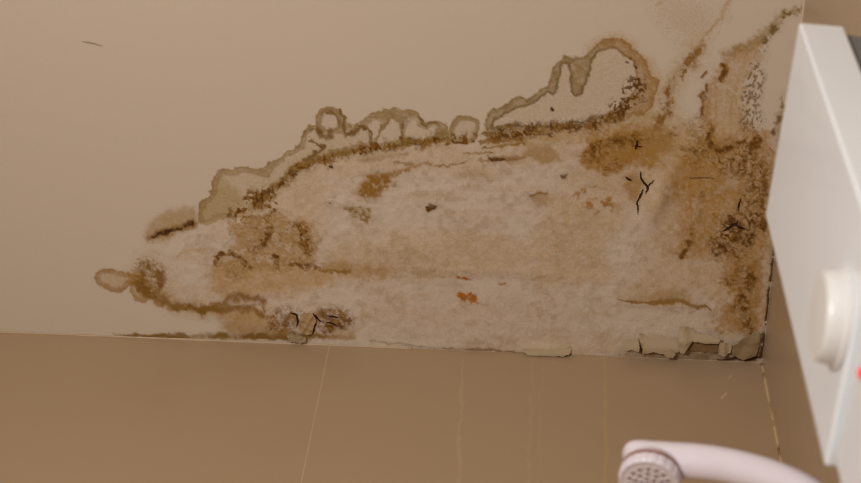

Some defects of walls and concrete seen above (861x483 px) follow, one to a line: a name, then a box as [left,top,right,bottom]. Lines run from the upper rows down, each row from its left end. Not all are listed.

water stain [92,0,803,363]
crack [625,172,654,213]
crack [723,199,745,231]
peeling [622,333,680,358]